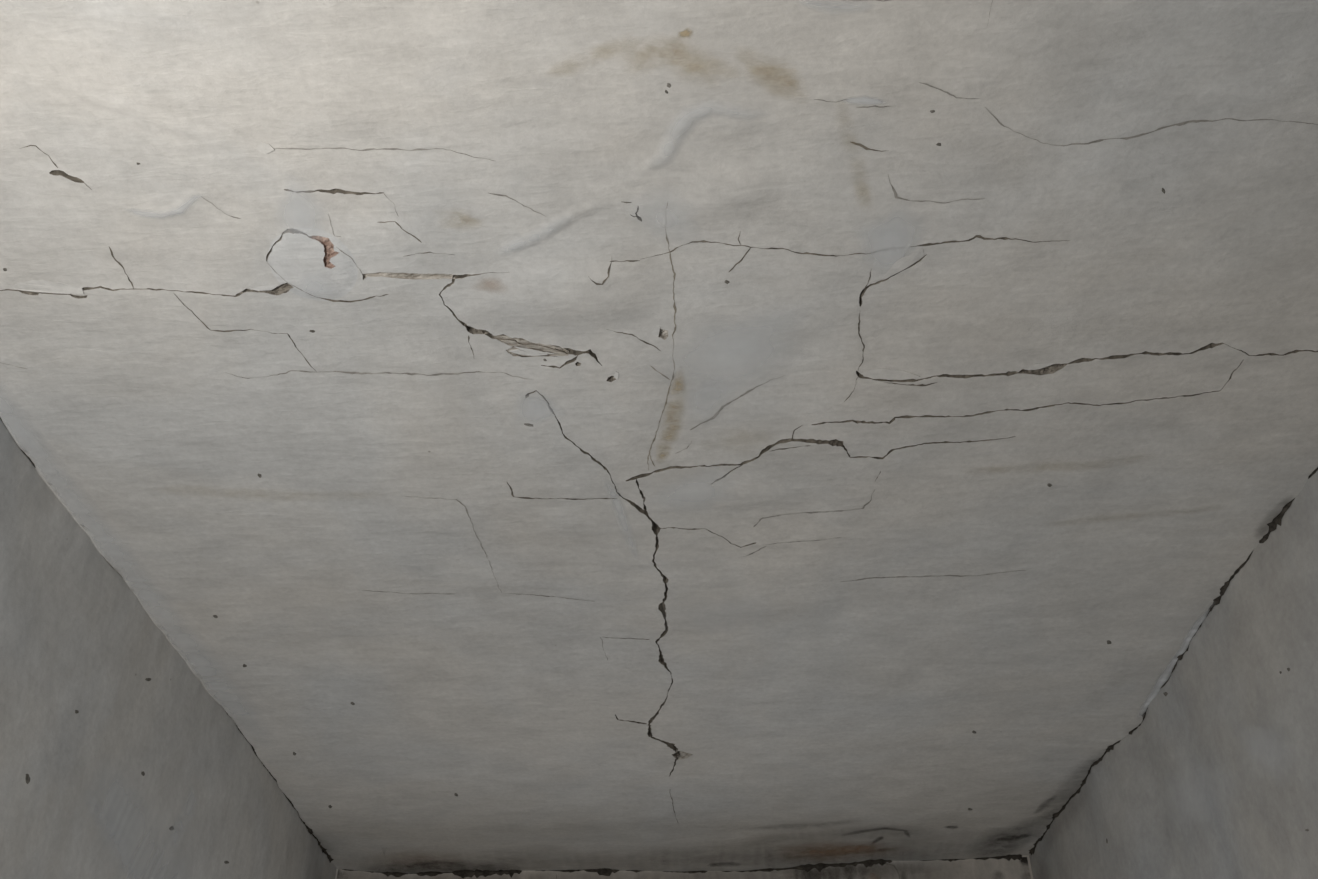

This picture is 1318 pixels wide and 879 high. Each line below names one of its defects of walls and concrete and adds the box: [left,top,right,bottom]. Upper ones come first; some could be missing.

crack [814,98,890,108]
crack [919,82,1318,146]
crack [256,142,494,161]
crack [851,142,985,204]
spalling [308,235,339,268]
crack [0,189,1318,879]